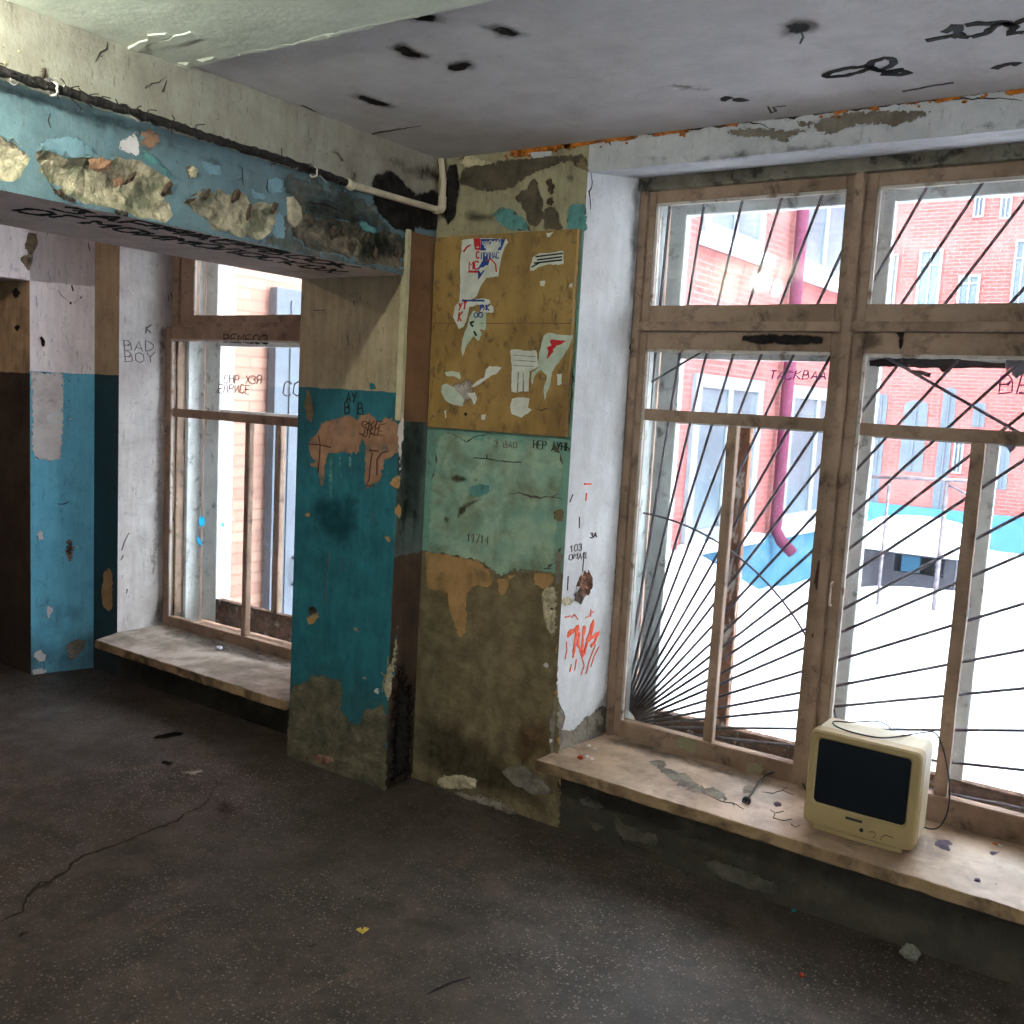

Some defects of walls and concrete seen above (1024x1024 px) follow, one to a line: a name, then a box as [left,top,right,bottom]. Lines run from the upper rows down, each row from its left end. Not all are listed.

spalling [0,128,405,274]
leakage [419,167,439,182]
rust [652,128,698,137]
peeling [726,110,931,144]
rust [905,93,988,108]
peeling [31,371,72,461]
peeling [304,388,404,498]
peeling [101,569,113,611]
peeling [412,432,606,828]
peeling [287,626,398,791]
leakage [389,664,415,784]
crack [0,780,218,923]